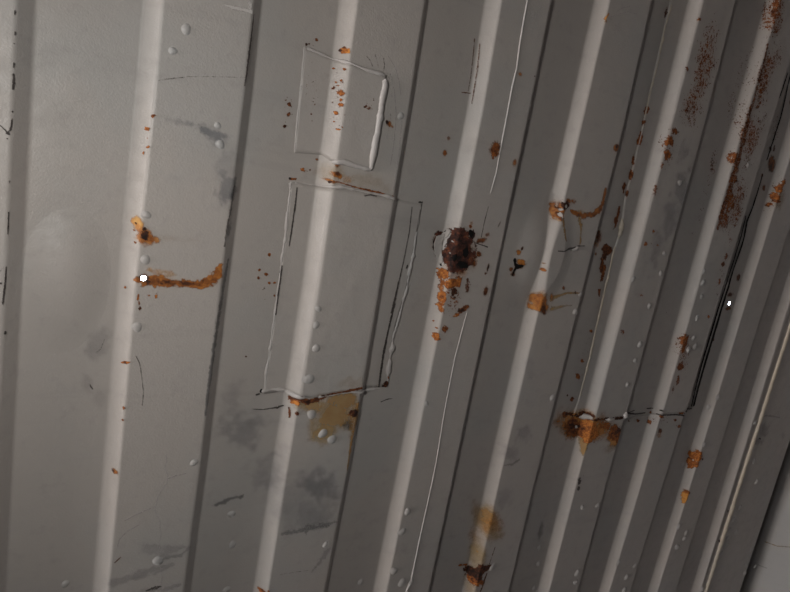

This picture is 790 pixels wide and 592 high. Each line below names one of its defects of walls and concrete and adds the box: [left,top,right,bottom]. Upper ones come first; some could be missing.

rust [331,67,346,130]
rust [659,13,719,168]
rust [710,0,786,297]
rust [131,216,159,245]
rust [124,263,223,310]
rust [527,286,579,315]
rust [549,188,607,244]
rust [594,230,613,296]
crack [627,73,790,428]
rust [556,411,624,455]
rust [686,450,703,469]
rust [458,546,495,592]